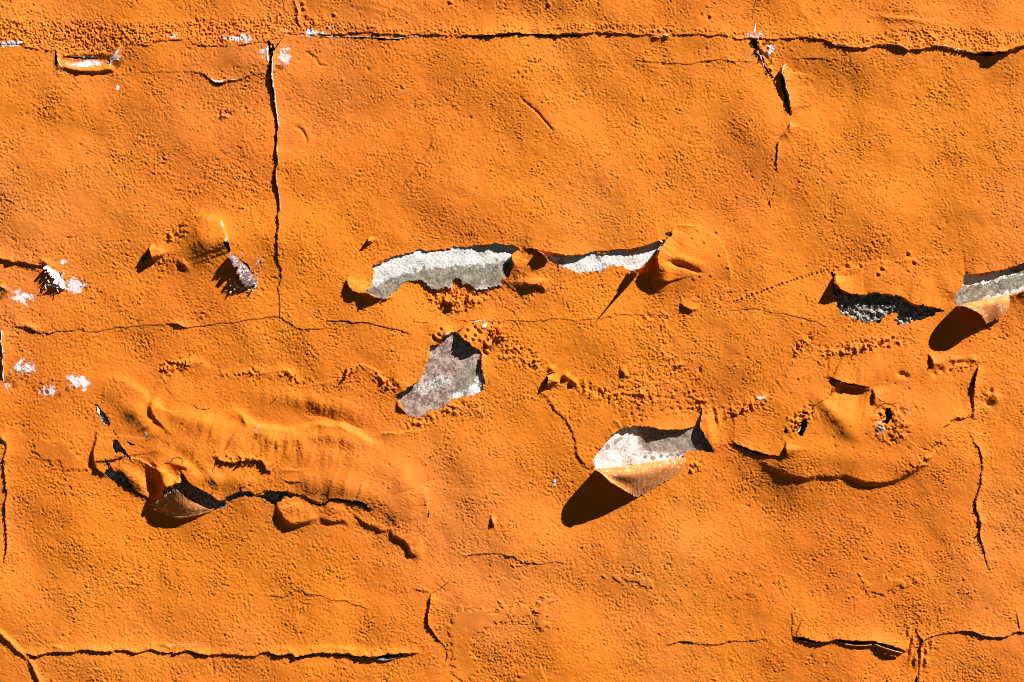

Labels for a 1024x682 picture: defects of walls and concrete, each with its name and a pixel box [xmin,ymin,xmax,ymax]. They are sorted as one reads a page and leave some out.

spalling [52,47,127,77]
crack [0,0,676,387]
crack [632,55,845,207]
peeling [341,223,737,427]
peeling [828,250,1024,330]
peeling [576,404,720,501]
crack [963,360,992,573]
crack [0,551,568,682]
crack [662,611,1024,682]